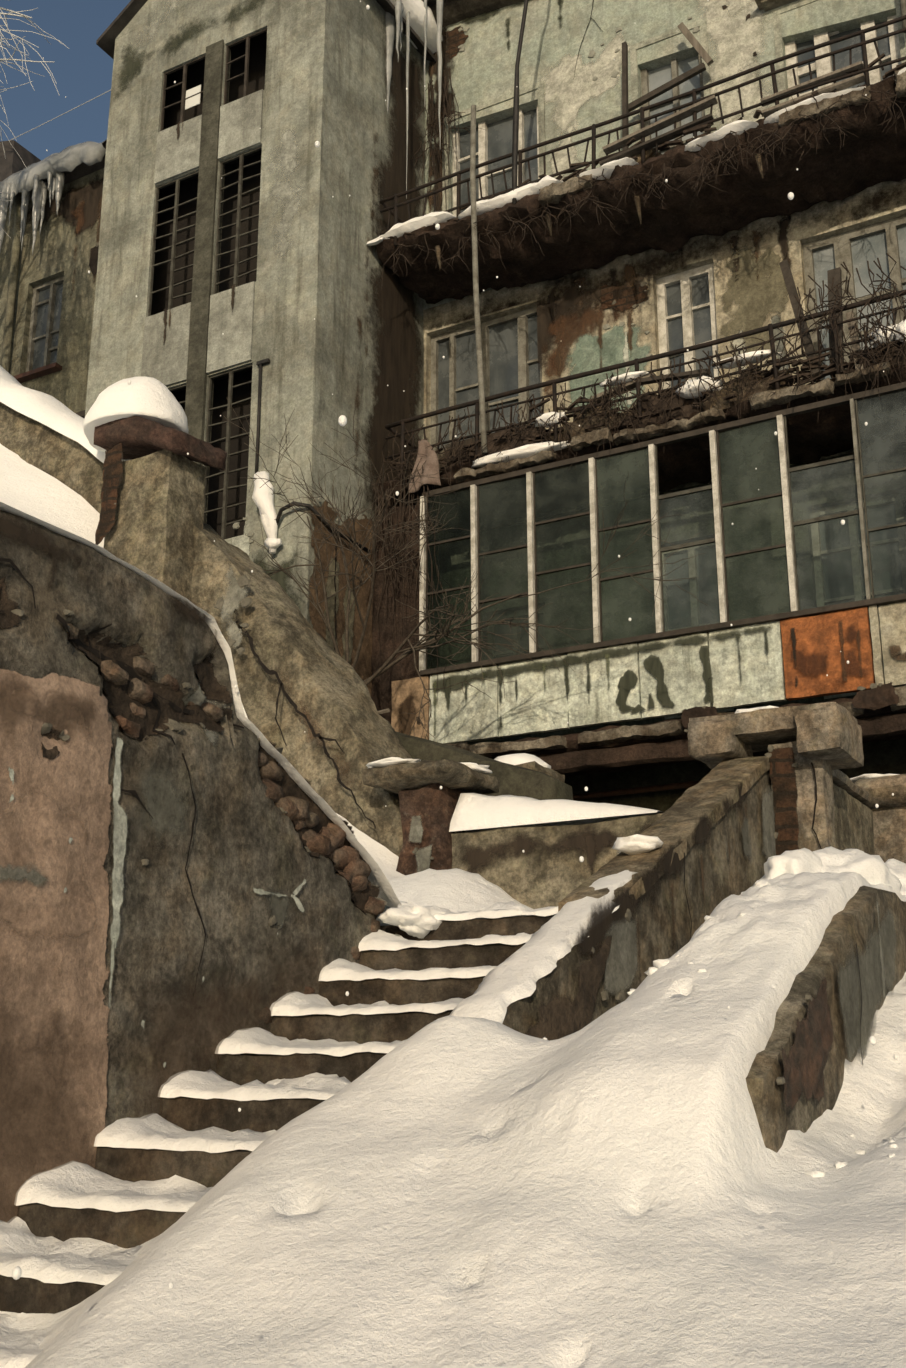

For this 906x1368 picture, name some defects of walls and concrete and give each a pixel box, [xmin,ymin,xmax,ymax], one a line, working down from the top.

flaking render [687,0,769,126]
peeling [568,282,653,412]
spalling [0,577,25,629]
damp [398,626,772,735]
rust [791,621,866,686]
damp [889,645,906,661]
spalling [258,738,387,932]
flaking render [0,609,233,1222]
spalling [259,1007,273,1023]